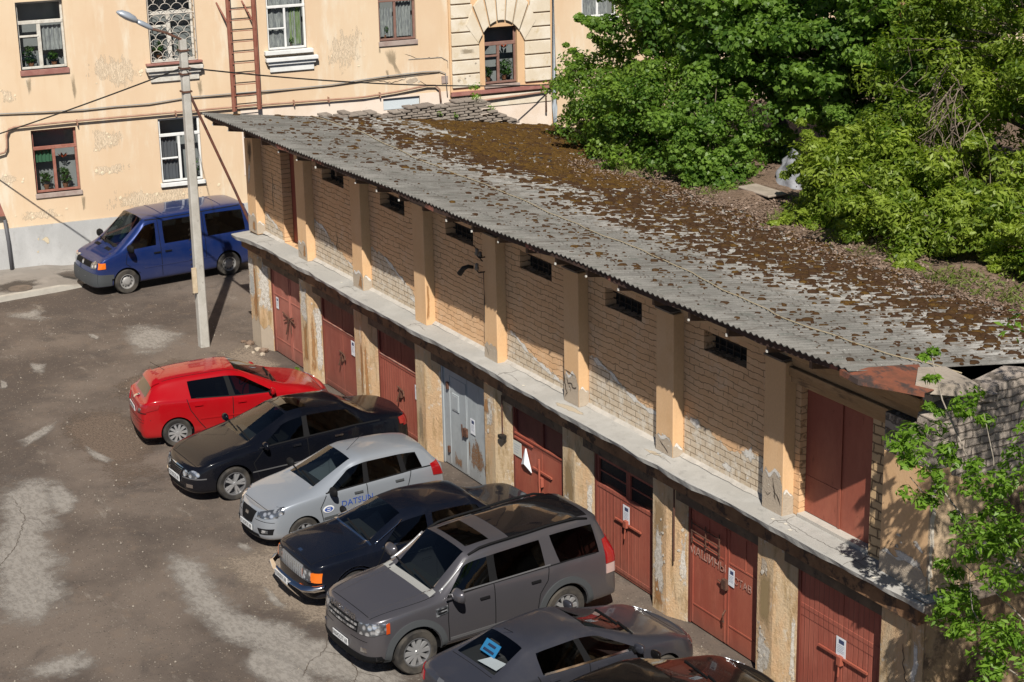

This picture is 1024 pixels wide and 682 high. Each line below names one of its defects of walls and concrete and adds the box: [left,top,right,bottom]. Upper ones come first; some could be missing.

rust [455,440,486,476]
flaking render [485,327,793,516]